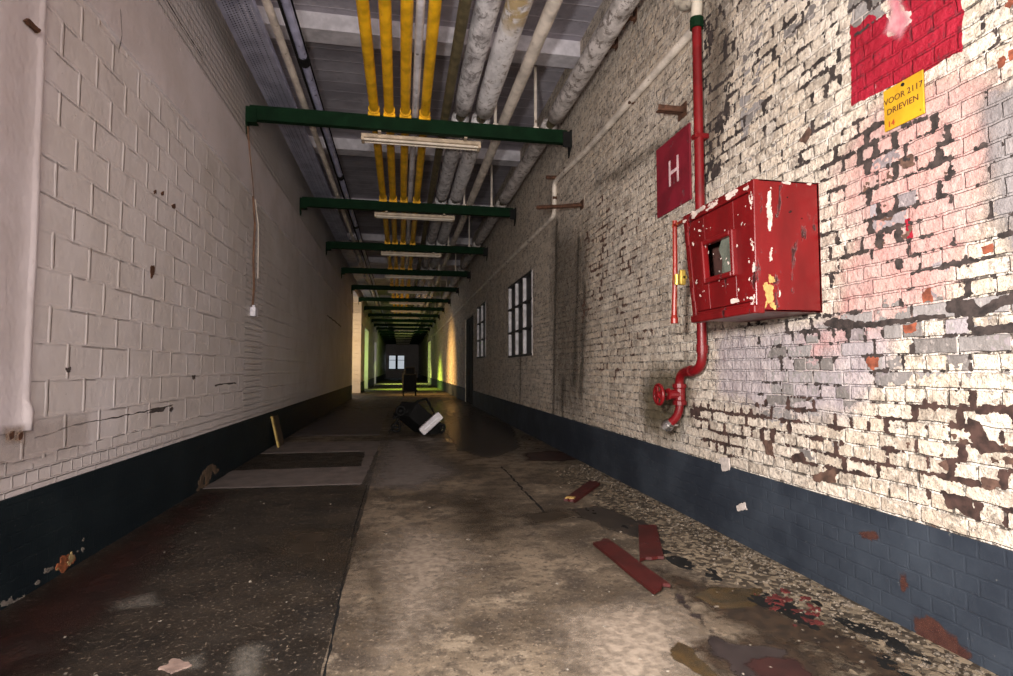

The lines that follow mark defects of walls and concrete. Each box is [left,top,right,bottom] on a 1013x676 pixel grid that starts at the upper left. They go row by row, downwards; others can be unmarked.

peeling [690,0,1013,521]
peeling [1002,507,1013,530]
peeling [35,538,85,585]